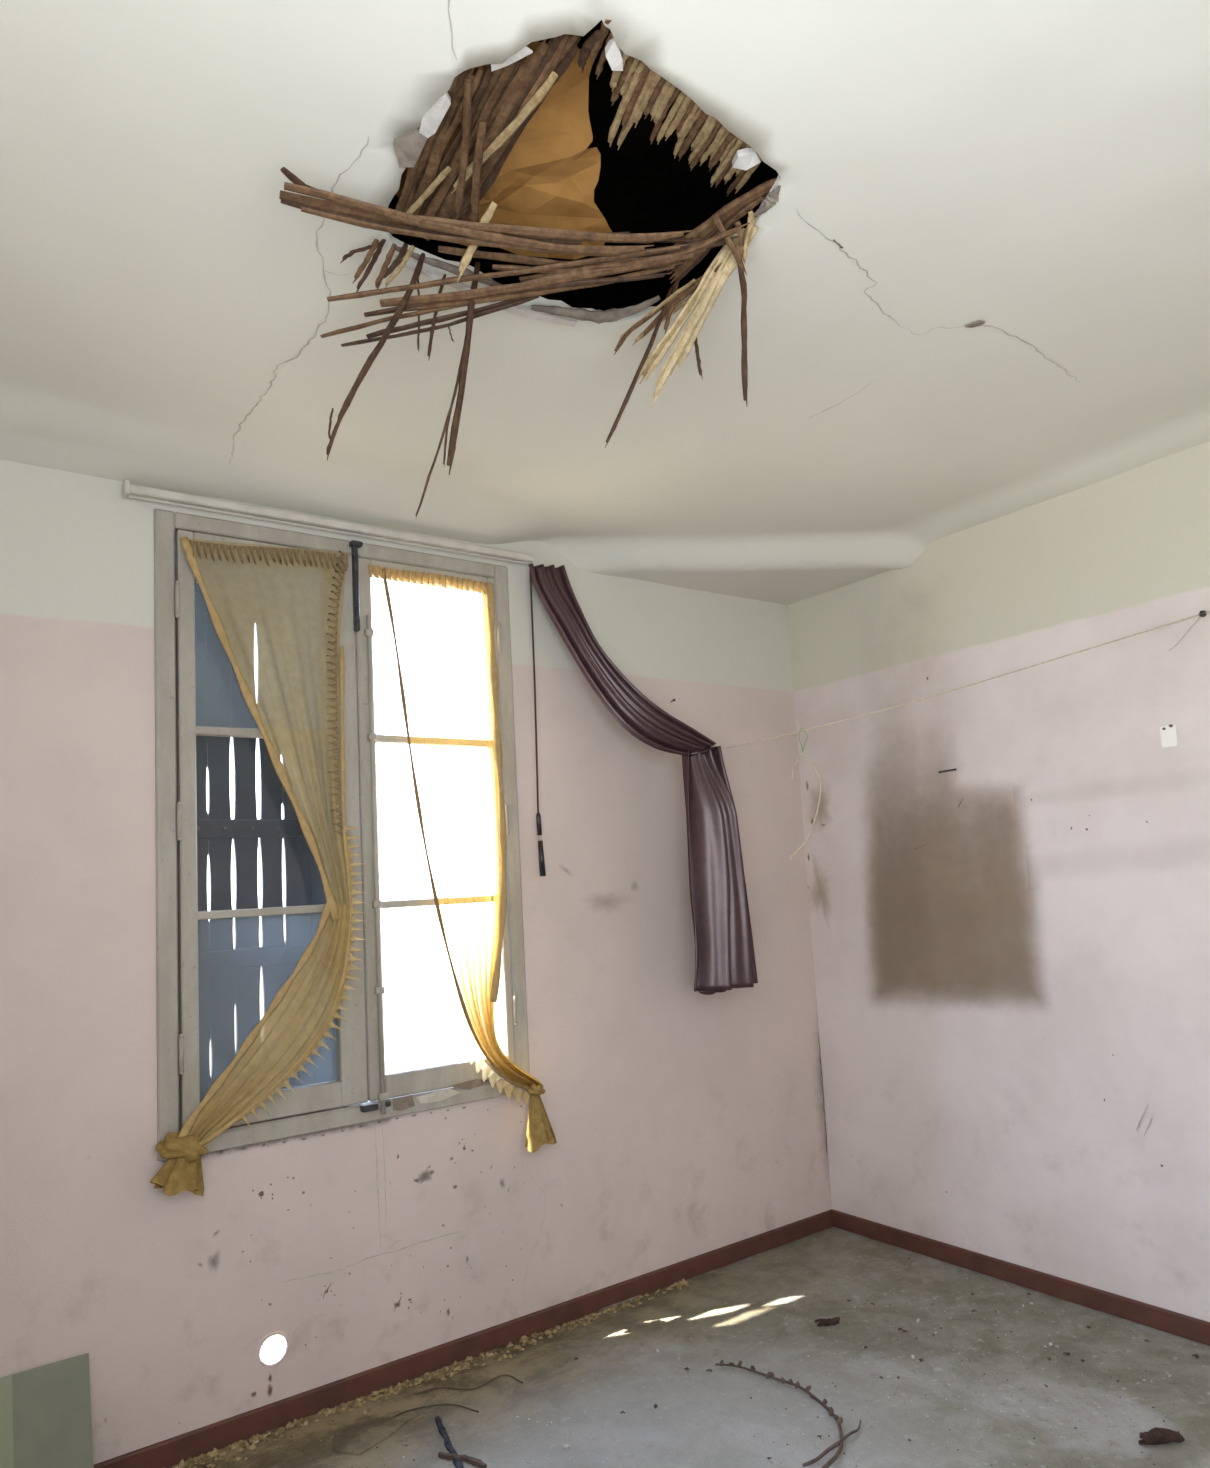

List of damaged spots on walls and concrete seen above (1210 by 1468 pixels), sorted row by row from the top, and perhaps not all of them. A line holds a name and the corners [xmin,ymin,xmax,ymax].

crack [448,0,457,60]
peeling [491,46,533,72]
peeling [605,37,623,71]
peeling [394,92,451,168]
peeling [732,147,761,171]
crack [229,137,369,463]
peeling [394,254,471,291]
peeling [487,300,577,327]
crack [796,208,1079,382]
damp [874,809,1032,994]